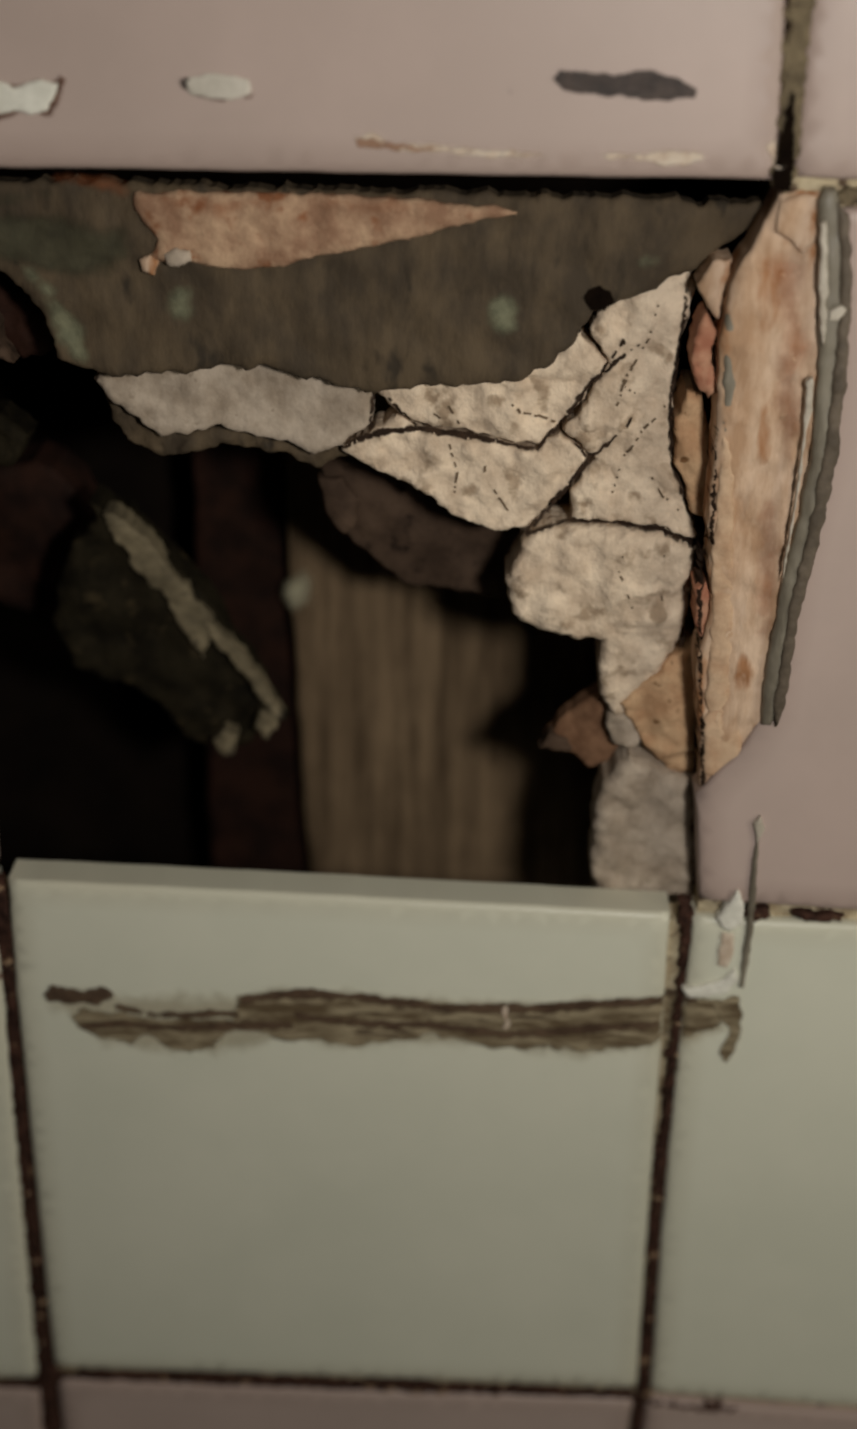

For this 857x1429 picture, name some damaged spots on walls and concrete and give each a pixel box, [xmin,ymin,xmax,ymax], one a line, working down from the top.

spalling [0,76,65,119]
spalling [181,73,252,101]
spalling [0,168,820,903]
crack [340,288,718,895]